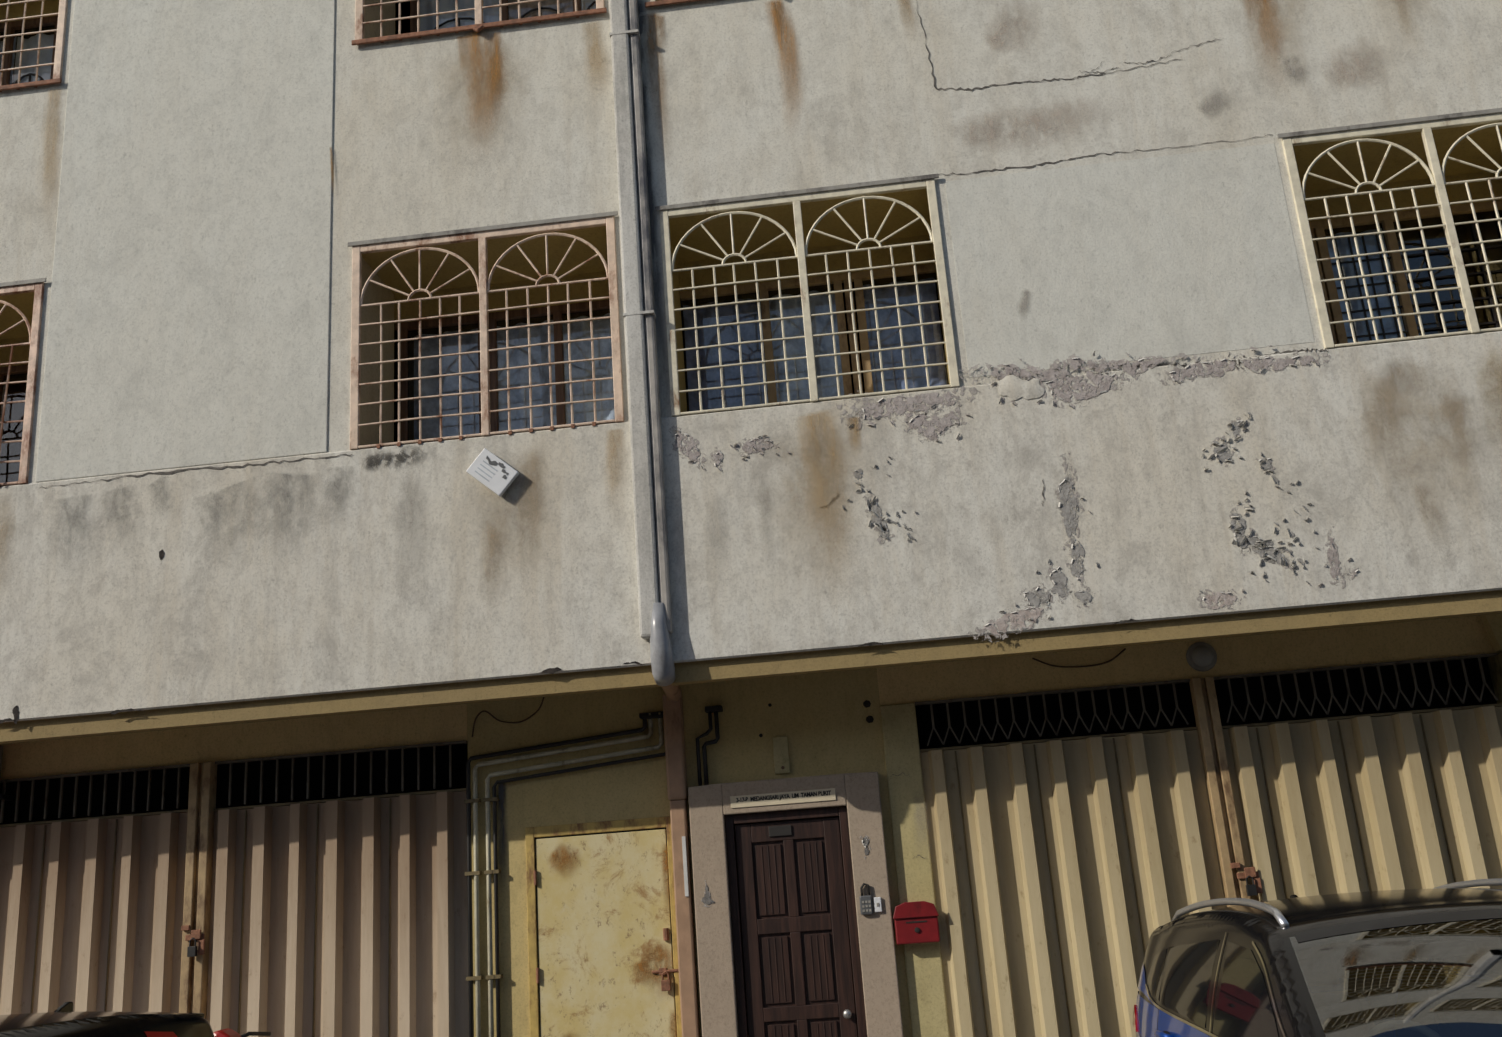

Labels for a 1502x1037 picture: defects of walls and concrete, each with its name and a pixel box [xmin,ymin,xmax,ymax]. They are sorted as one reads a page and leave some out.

corrosion [770,1,794,68]
crack [916,0,1222,91]
crack [938,134,1272,175]
spalling [837,345,1331,442]
peeling [1201,412,1300,492]
peeling [842,456,916,544]
spalling [968,453,1099,642]
peeling [1195,491,1358,610]